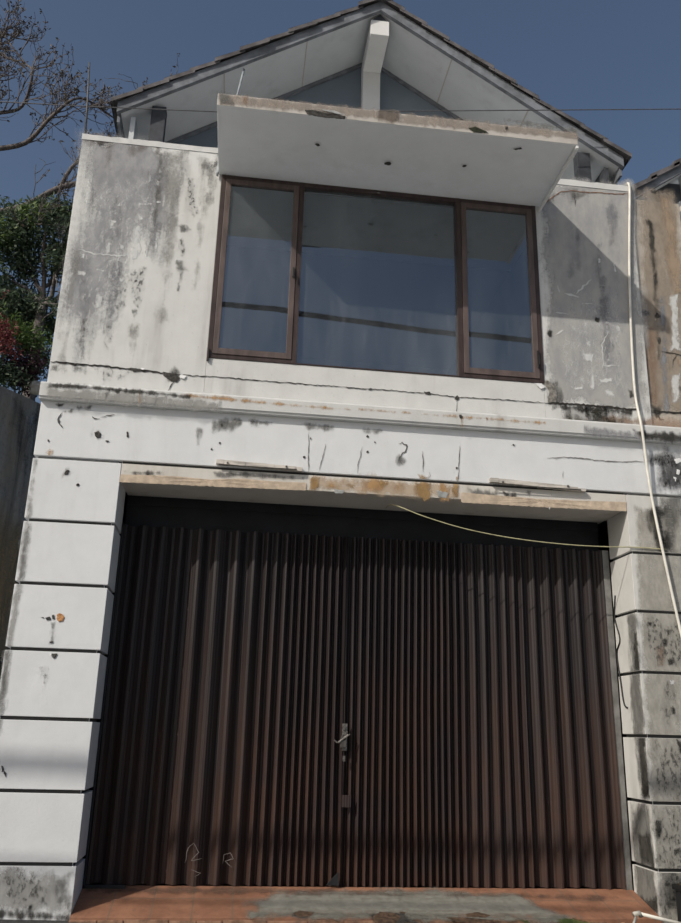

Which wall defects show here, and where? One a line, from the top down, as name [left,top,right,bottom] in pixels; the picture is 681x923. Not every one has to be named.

spalling [305,109,345,119]
leakage [63,140,195,340]
leakage [542,179,681,442]
peeling [670,295,680,350]
leakage [48,383,219,412]
crack [50,361,681,420]
peeling [671,375,679,402]
peeling [119,471,627,511]
leakage [0,504,31,722]
leakage [627,455,681,923]
leakage [0,869,70,921]
spalling [371,912,420,923]